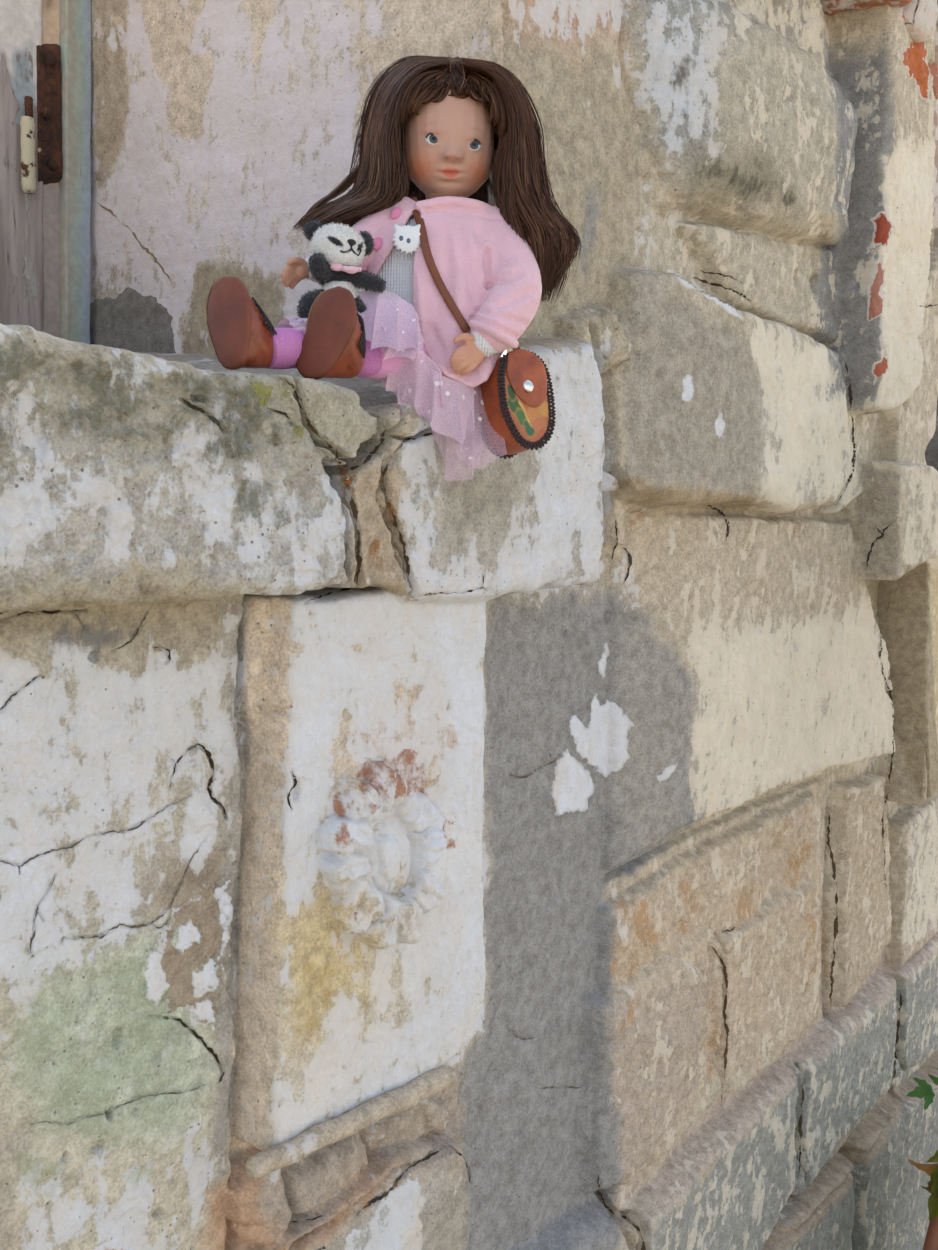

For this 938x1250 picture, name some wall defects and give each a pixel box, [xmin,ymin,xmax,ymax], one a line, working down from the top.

flaking render [866,210,895,322]
crack [181,398,223,430]
crack [271,378,487,603]
flaking render [871,336,889,385]
peeling [547,638,634,817]
crack [0,744,227,951]
flaking render [137,873,234,1032]
crack [827,814,838,1008]
crack [31,1016,225,1125]
crack [597,1176,646,1250]